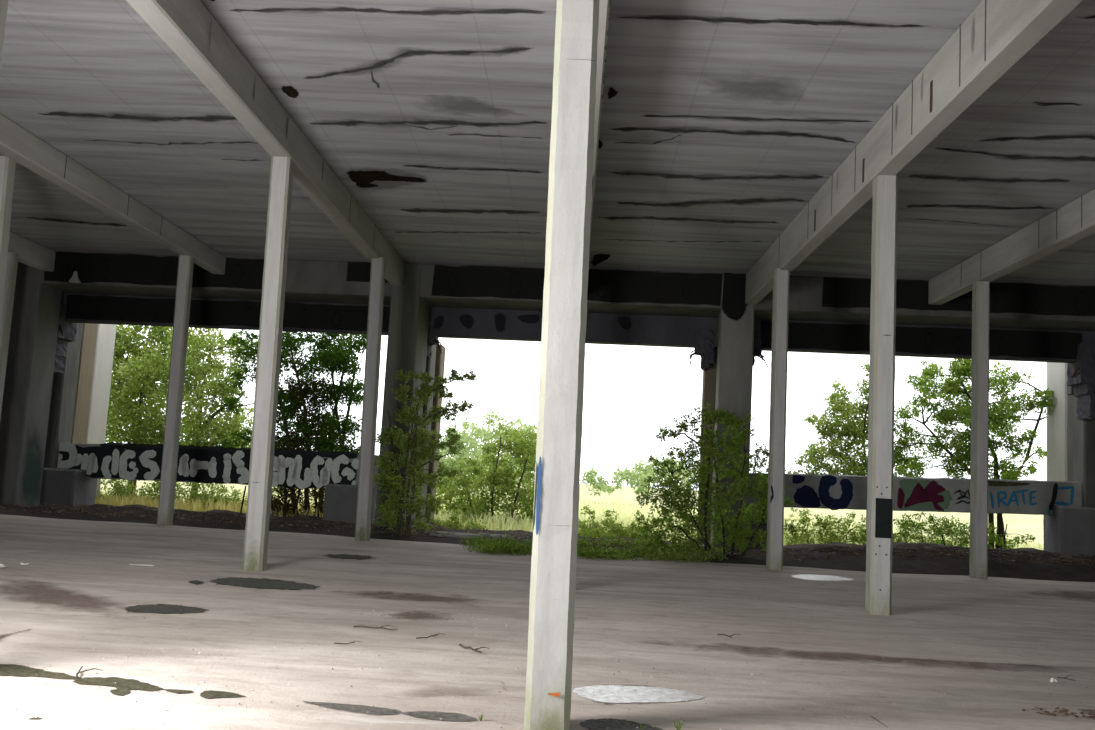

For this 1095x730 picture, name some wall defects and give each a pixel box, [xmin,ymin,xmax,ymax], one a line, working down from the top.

crack [232,7,543,15]
crack [618,16,921,27]
crack [306,48,530,88]
spalling [281,86,298,98]
crack [1034,100,1080,108]
crack [980,134,1095,142]
spalling [346,171,426,189]
spalling [591,254,610,266]